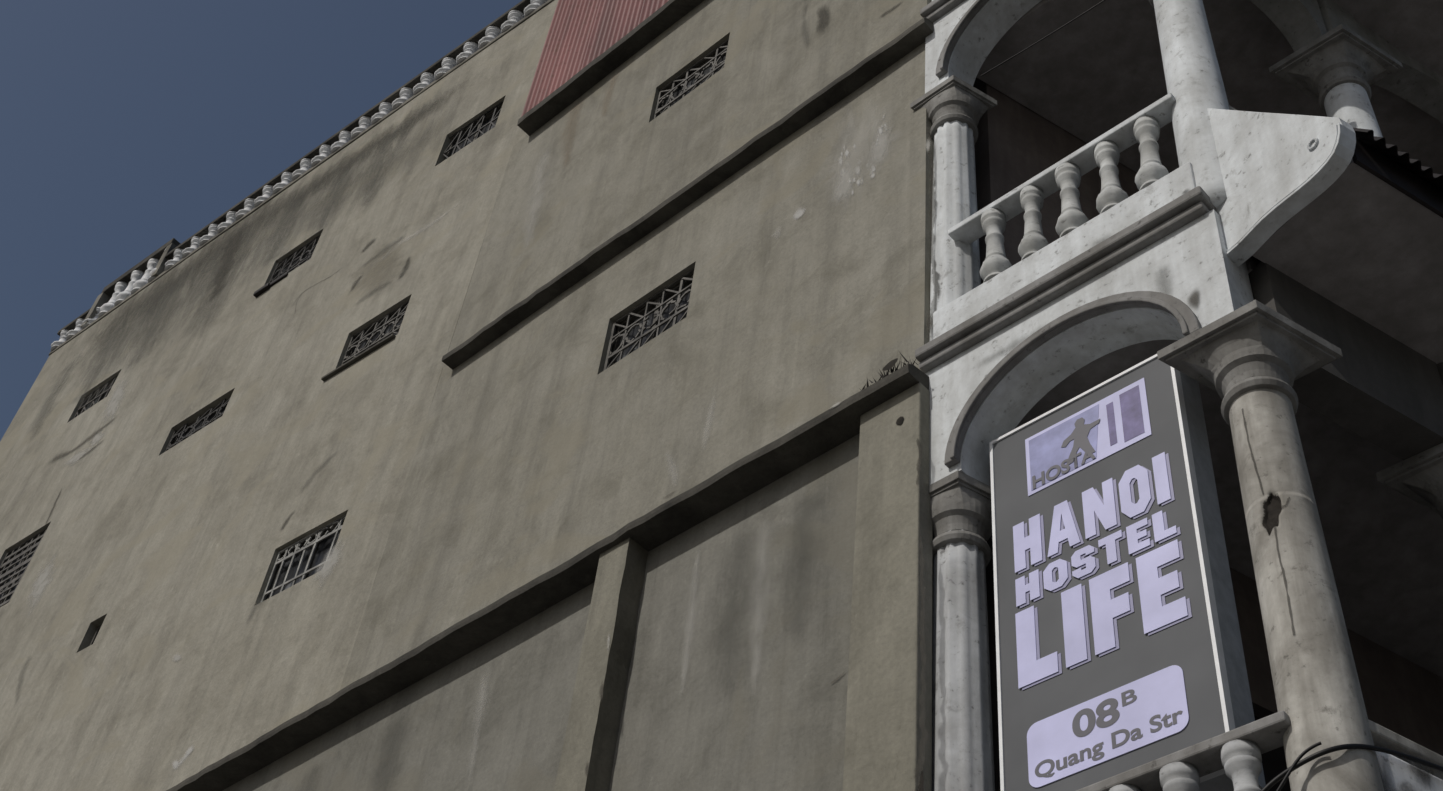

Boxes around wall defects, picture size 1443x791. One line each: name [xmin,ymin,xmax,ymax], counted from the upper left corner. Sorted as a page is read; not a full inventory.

peeling [837,116,888,197]
flaking render [1242,408,1295,635]
damp [1380,761,1430,791]